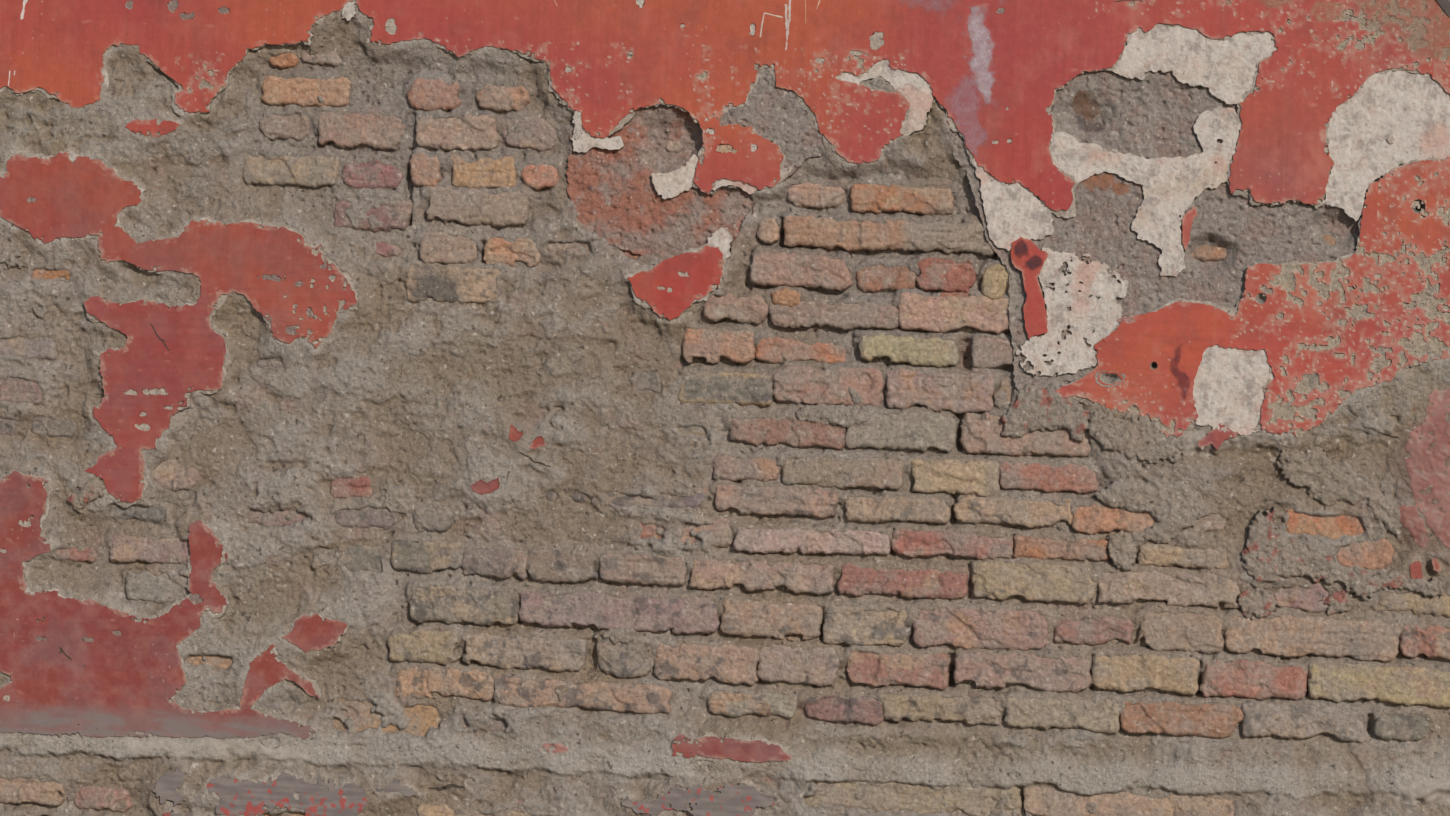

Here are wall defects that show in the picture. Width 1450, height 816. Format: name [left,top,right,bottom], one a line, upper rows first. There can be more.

peeling [1336,0,1445,52]
peeling [846,50,869,72]
peeling [1112,25,1277,105]
spalling [1051,70,1239,159]
peeling [651,154,698,199]
peeling [716,144,737,153]
peeling [1049,132,1198,188]
peeling [1403,196,1450,226]
peeling [1260,263,1307,307]
peeling [1307,258,1389,326]
peeling [1355,232,1450,325]
peeling [1079,299,1123,345]